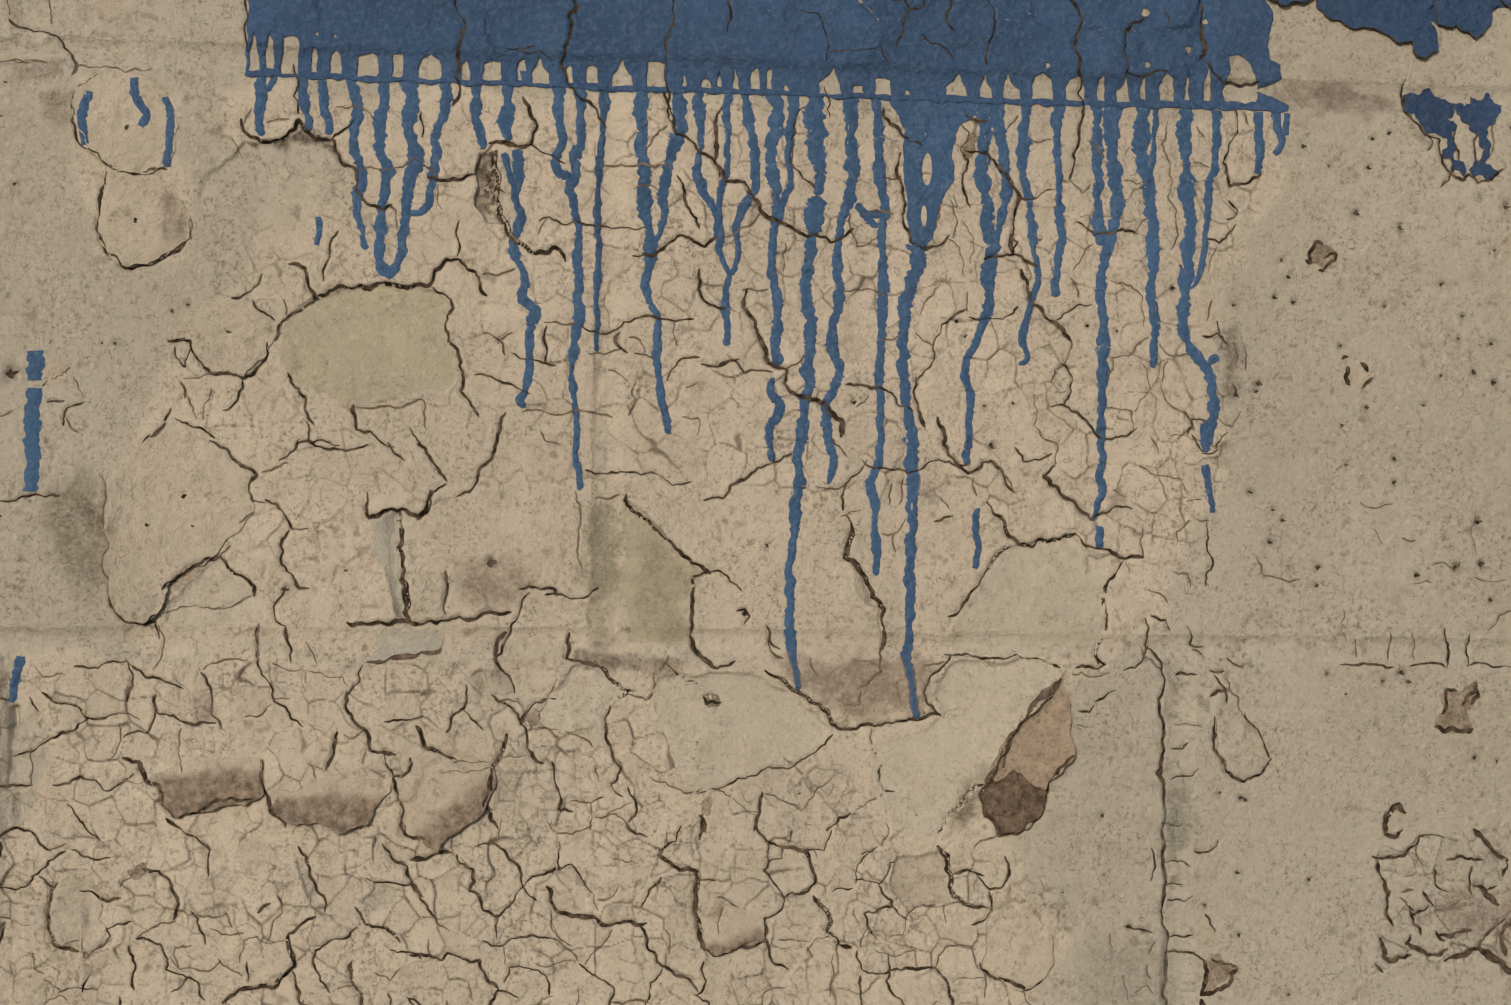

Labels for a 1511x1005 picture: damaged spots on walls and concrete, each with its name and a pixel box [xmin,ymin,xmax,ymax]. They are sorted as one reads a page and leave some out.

peeling [1271,0,1511,58]
crack [0,0,193,270]
peeling [1400,88,1511,179]
crack [0,367,85,433]
peeling [170,283,456,403]
peeling [103,417,257,631]
crack [142,0,1272,1005]
crack [0,475,286,877]
crack [0,826,327,1005]
peeling [147,749,496,853]
peeling [870,533,1111,907]
crack [1372,802,1511,975]